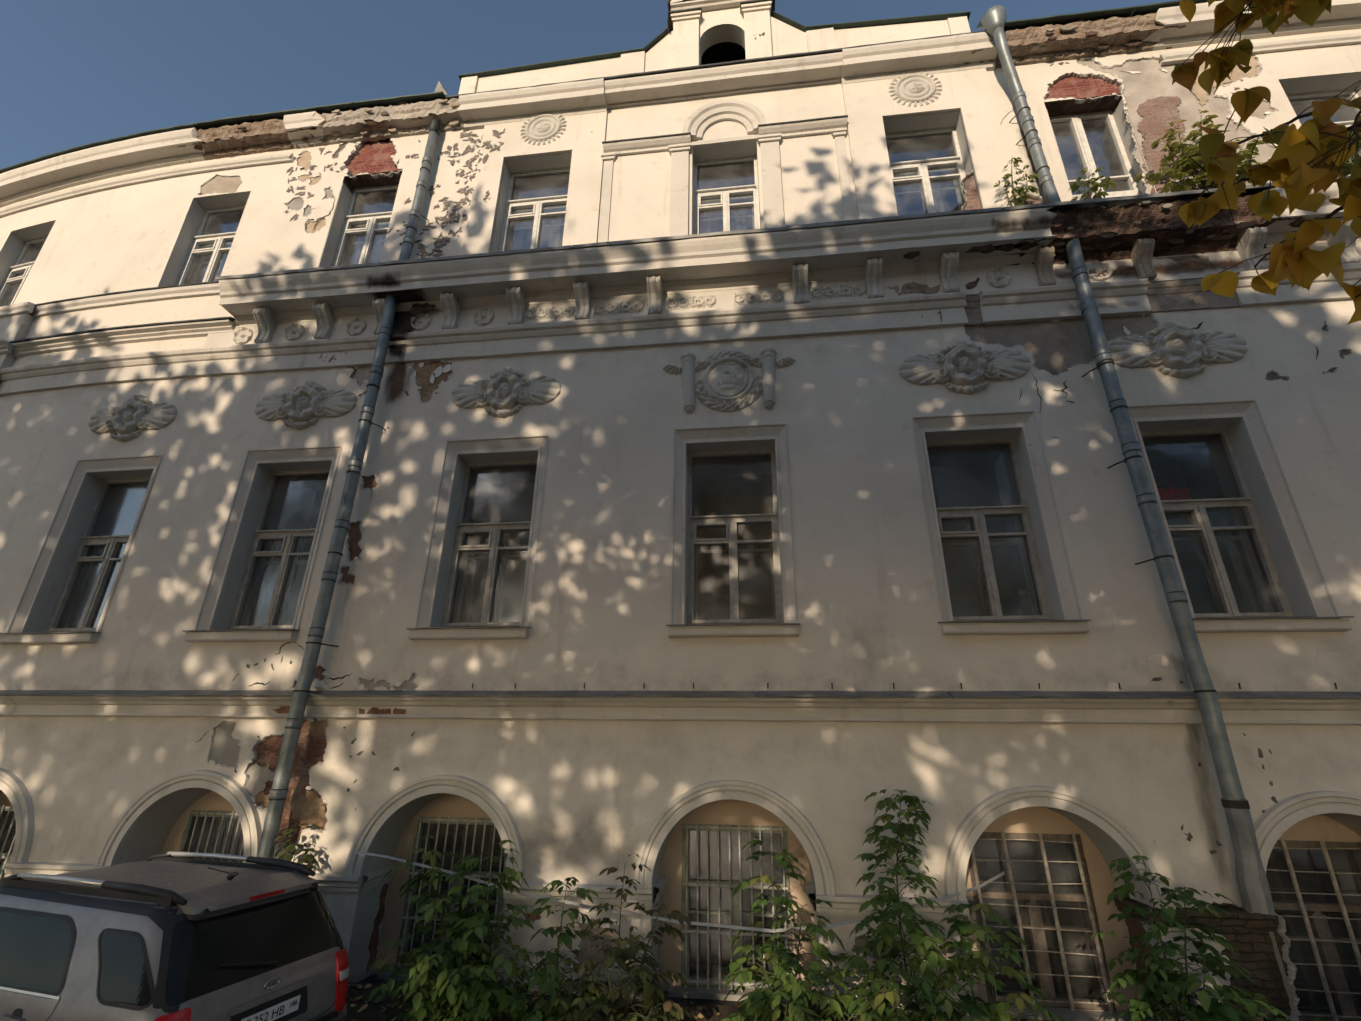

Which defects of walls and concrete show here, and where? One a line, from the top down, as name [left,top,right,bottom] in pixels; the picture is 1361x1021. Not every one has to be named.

spalling [177,98,505,259]
spalling [961,13,1324,377]
spalling [397,360,454,403]
spalling [337,520,363,585]
spalling [207,706,376,850]